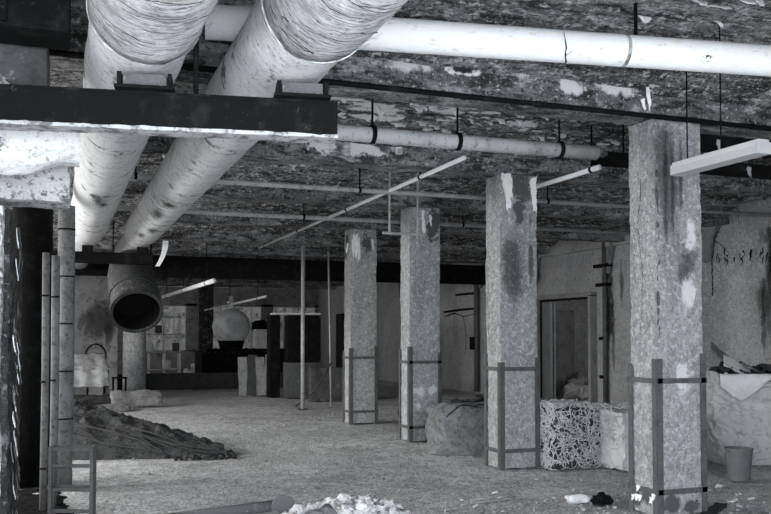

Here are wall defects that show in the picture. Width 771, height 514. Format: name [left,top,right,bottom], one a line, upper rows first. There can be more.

peeling [692,0,732,10]
peeling [641,87,651,111]
peeling [331,97,566,141]
damp [686,219,696,250]
peeling [716,247,771,265]
damp [681,277,696,307]
damp [675,363,694,395]